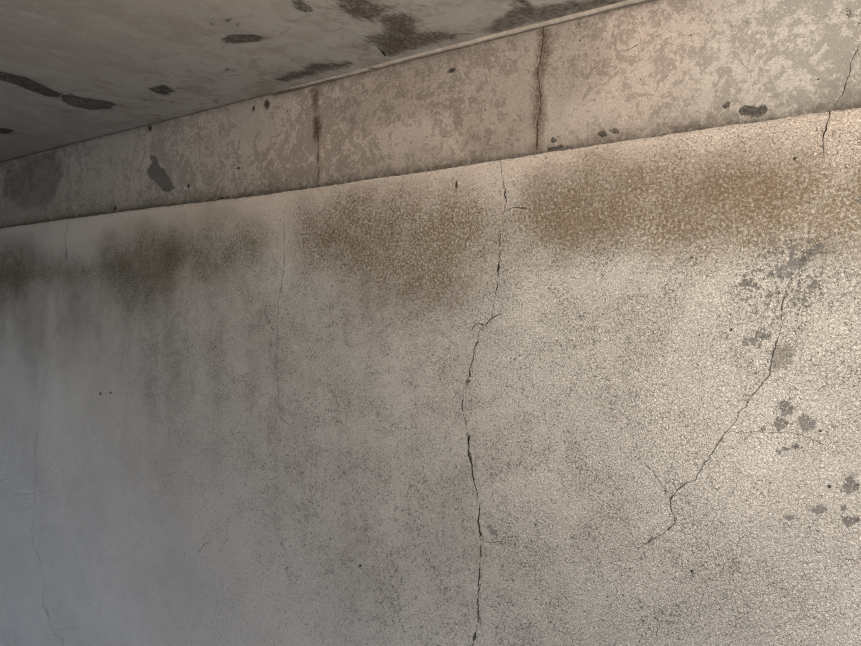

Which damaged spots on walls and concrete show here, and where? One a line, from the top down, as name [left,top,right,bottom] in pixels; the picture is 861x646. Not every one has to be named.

leakage [492,0,625,32]
crack [536,26,544,153]
crack [823,44,861,150]
spalling [147,154,175,192]
leakage [302,195,499,300]
leakage [526,163,861,251]
crack [461,160,526,646]
crack [638,278,800,548]